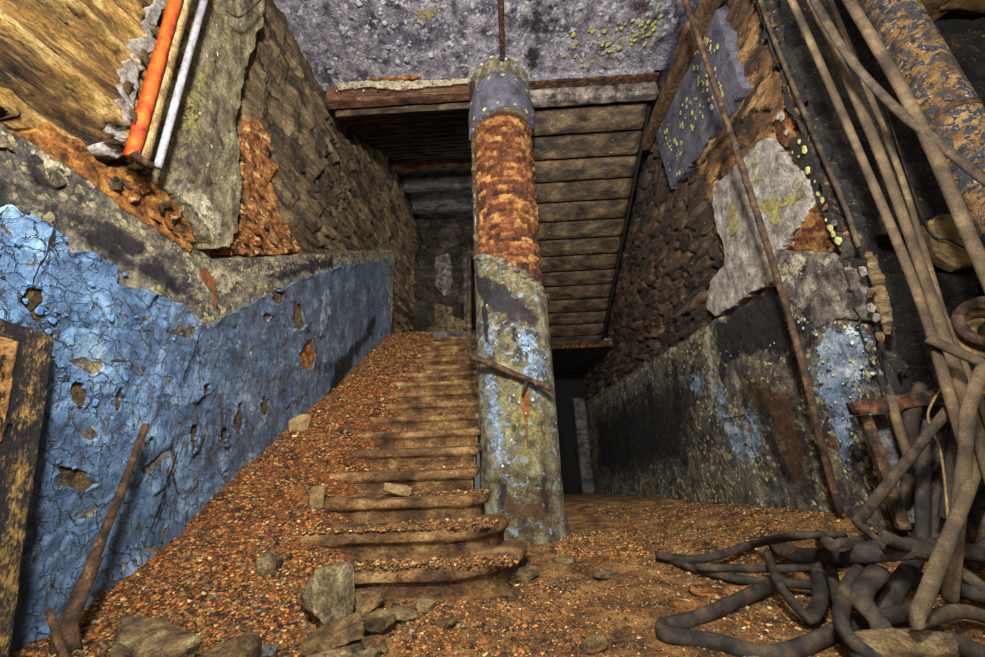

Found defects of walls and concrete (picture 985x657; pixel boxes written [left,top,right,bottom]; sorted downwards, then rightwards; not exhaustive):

peeling [122,79,135,95]
spalling [15,122,196,253]
spalling [211,119,302,257]
spalling [770,111,842,253]
crack [28,219,59,293]
peeling [0,205,391,649]
rust [521,392,529,444]